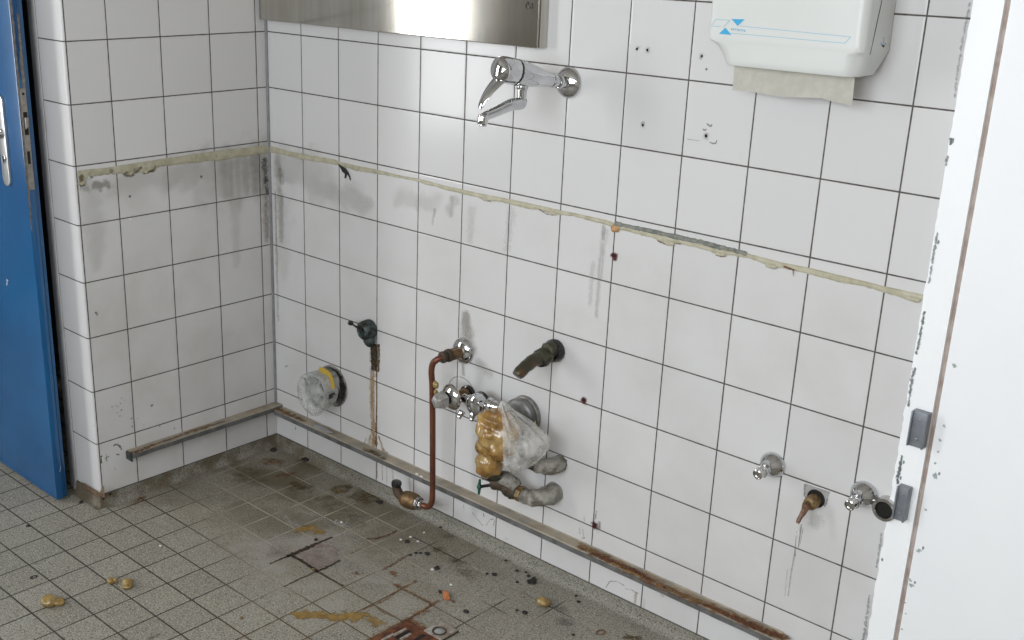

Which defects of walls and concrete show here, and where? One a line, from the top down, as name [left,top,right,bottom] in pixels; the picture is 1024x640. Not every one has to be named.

rust [364,344,386,460]
rust [578,545,790,640]